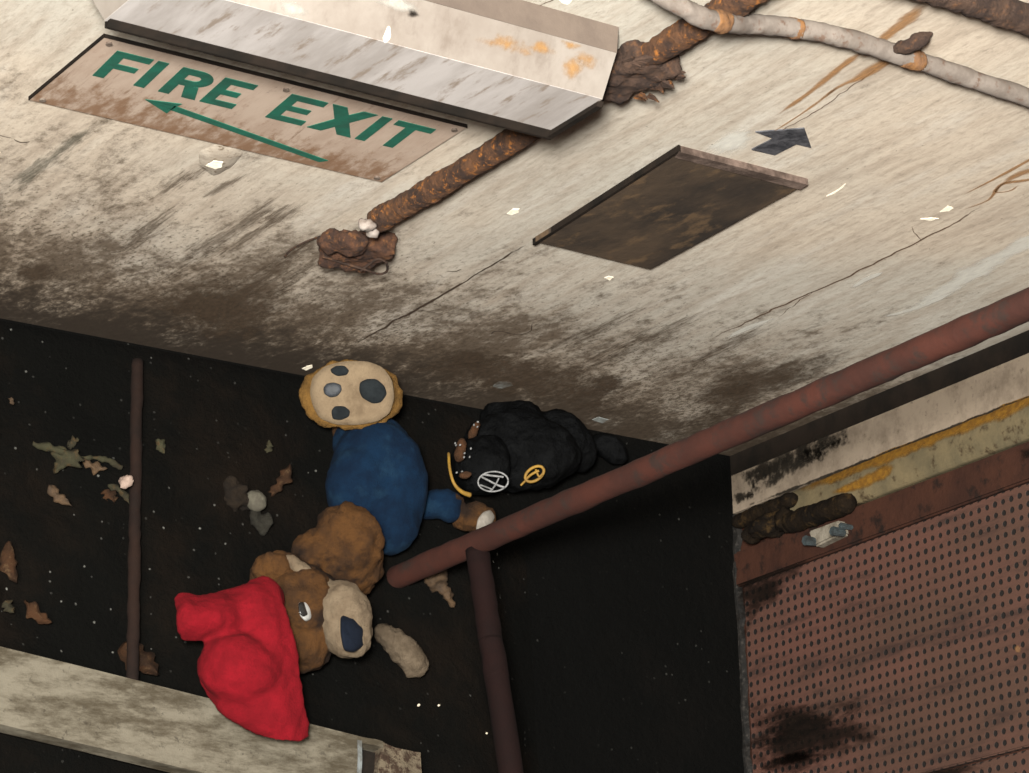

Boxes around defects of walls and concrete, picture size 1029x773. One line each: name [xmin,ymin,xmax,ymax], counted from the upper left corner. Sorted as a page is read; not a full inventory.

corrosion [786,17,806,40]
corrosion [881,9,919,39]
corrosion [633,63,686,102]
corrosion [778,50,928,129]
leakage [22,135,83,182]
corrosion [971,159,1029,207]
leakage [181,201,294,268]
crack [722,215,967,333]
leakage [418,341,632,411]
leakage [735,430,847,504]
corrosion [769,396,1029,498]
leakage [758,706,871,769]